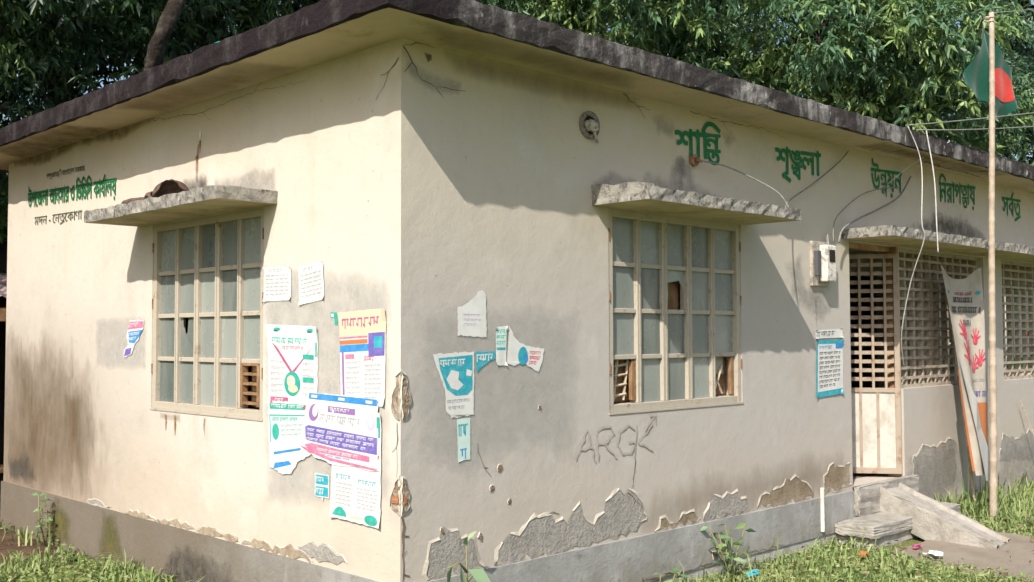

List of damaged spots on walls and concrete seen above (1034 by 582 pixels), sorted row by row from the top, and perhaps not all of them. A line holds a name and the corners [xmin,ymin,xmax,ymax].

crack [376,42,462,99]
flaking render [391,369,411,422]
flaking render [87,498,110,508]
flaking render [125,509,347,565]
flaking render [390,475,410,518]
flaking render [422,462,851,581]